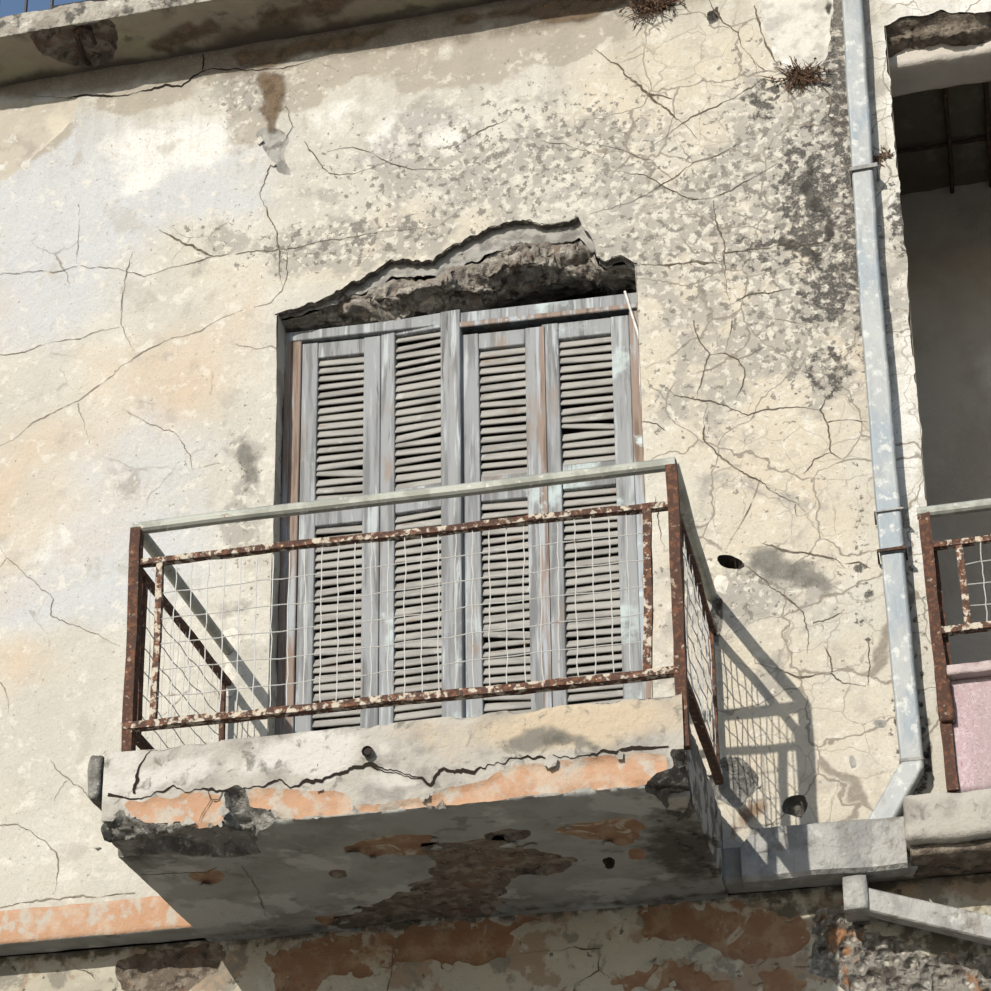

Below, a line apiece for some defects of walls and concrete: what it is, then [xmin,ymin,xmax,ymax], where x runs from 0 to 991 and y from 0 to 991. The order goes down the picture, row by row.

spalling [29,19,118,67]
crack [40,54,317,98]
damp [235,28,386,132]
spalling [884,11,991,58]
damp [800,163,835,241]
crack [0,106,503,446]
spalling [282,240,637,333]
damp [778,236,819,265]
crack [545,0,871,686]
damp [751,549,827,587]
crack [51,746,669,821]
peeling [95,749,695,860]